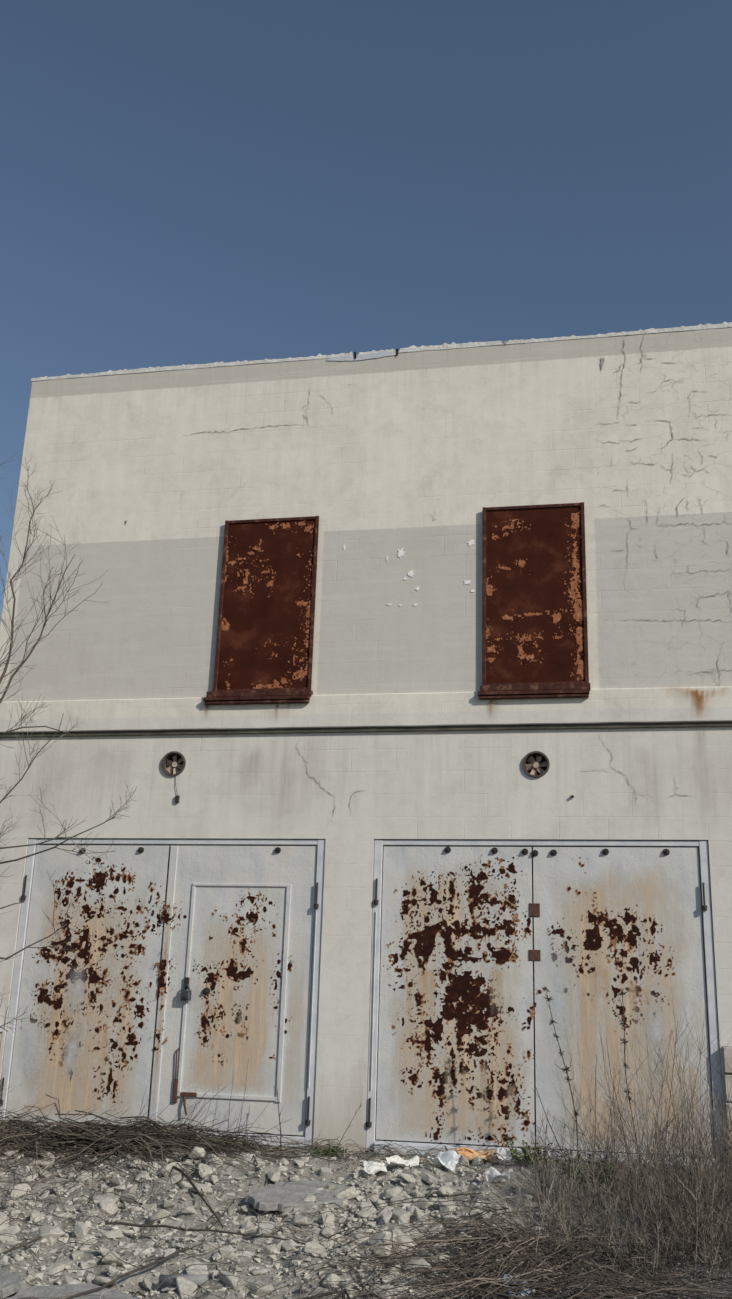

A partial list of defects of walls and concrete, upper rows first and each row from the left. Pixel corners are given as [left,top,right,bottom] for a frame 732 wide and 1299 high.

crack [594,335,732,685]
crack [296,744,365,821]
corrosion [21,851,293,1114]
corrosion [383,854,688,1148]